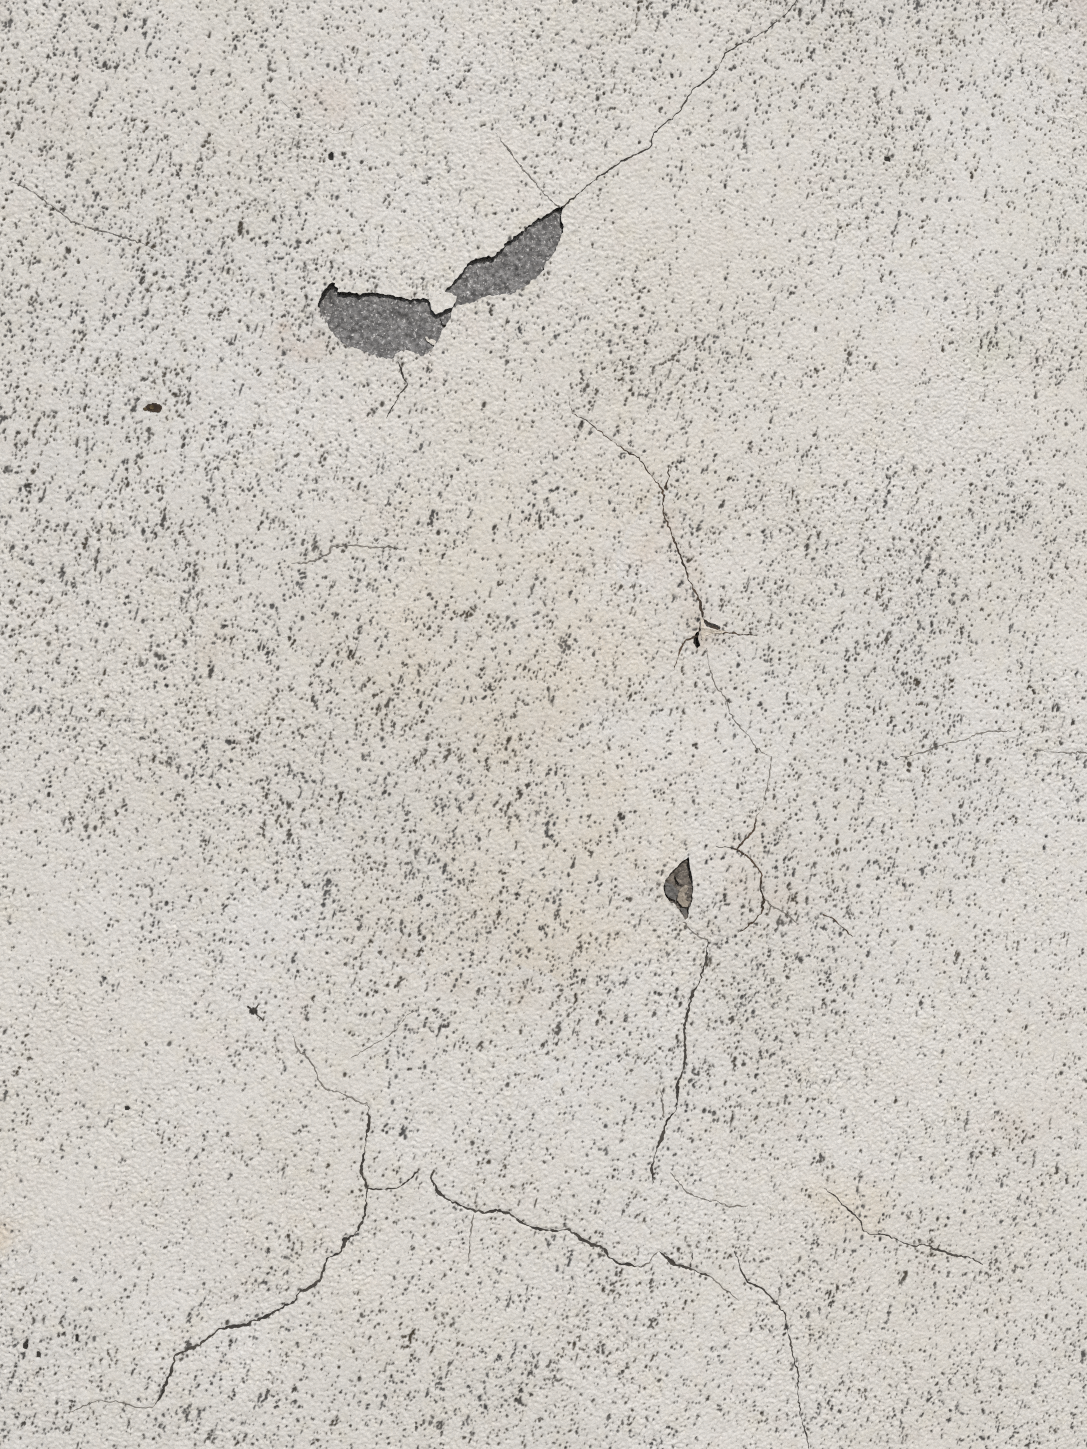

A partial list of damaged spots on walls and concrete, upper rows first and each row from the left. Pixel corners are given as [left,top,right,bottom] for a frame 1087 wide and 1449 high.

peeling [318,206,564,359]
spalling [663,857,693,920]
crack [351,1010,416,1058]
crack [68,1036,809,1448]